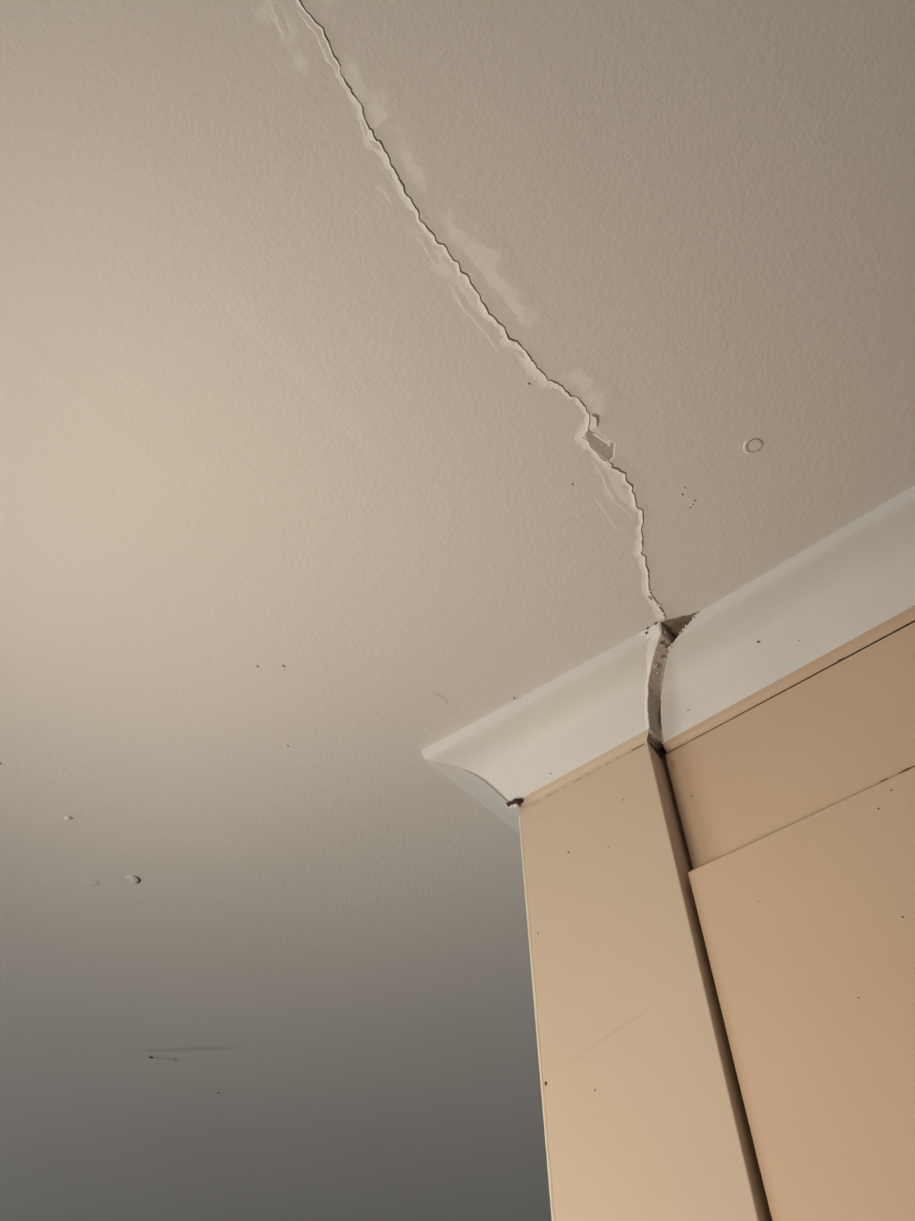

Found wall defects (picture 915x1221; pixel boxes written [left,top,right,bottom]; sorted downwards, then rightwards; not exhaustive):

crack [295,0,913,809]